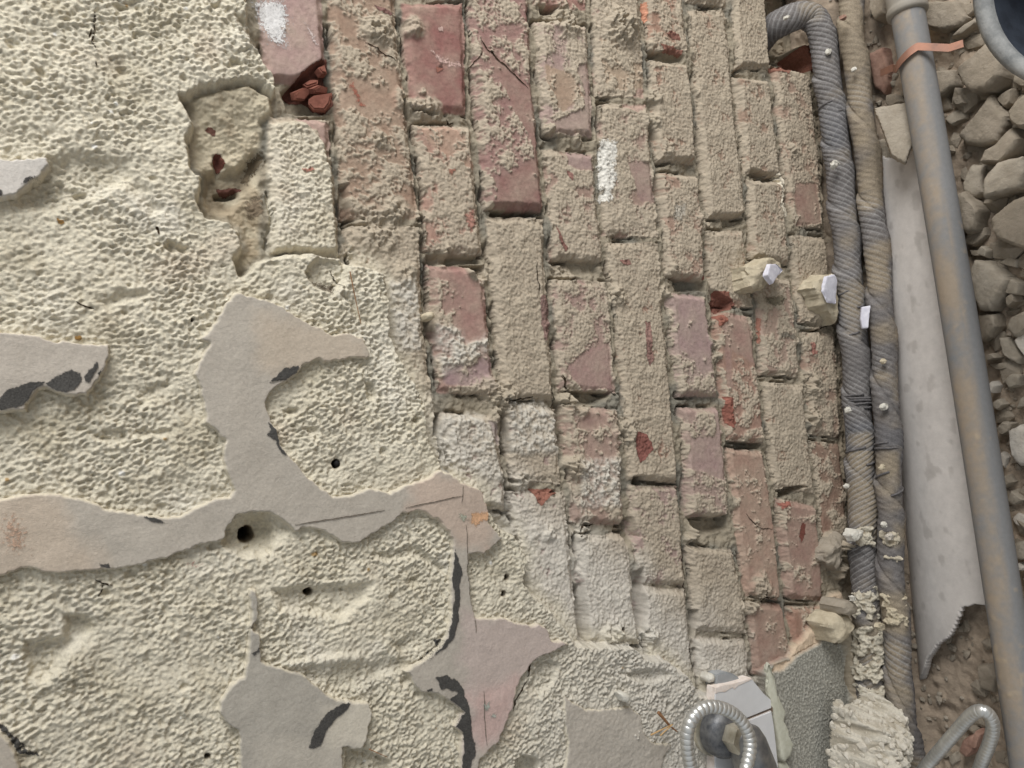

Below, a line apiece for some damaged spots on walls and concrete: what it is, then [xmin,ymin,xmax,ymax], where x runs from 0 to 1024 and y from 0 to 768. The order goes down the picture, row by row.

damp [251,0,290,49]
crack [466,37,528,88]
peeling [0,157,51,203]
damp [595,138,618,204]
spalling [182,0,856,694]
peeling [0,293,569,768]
spalling [838,614,857,704]